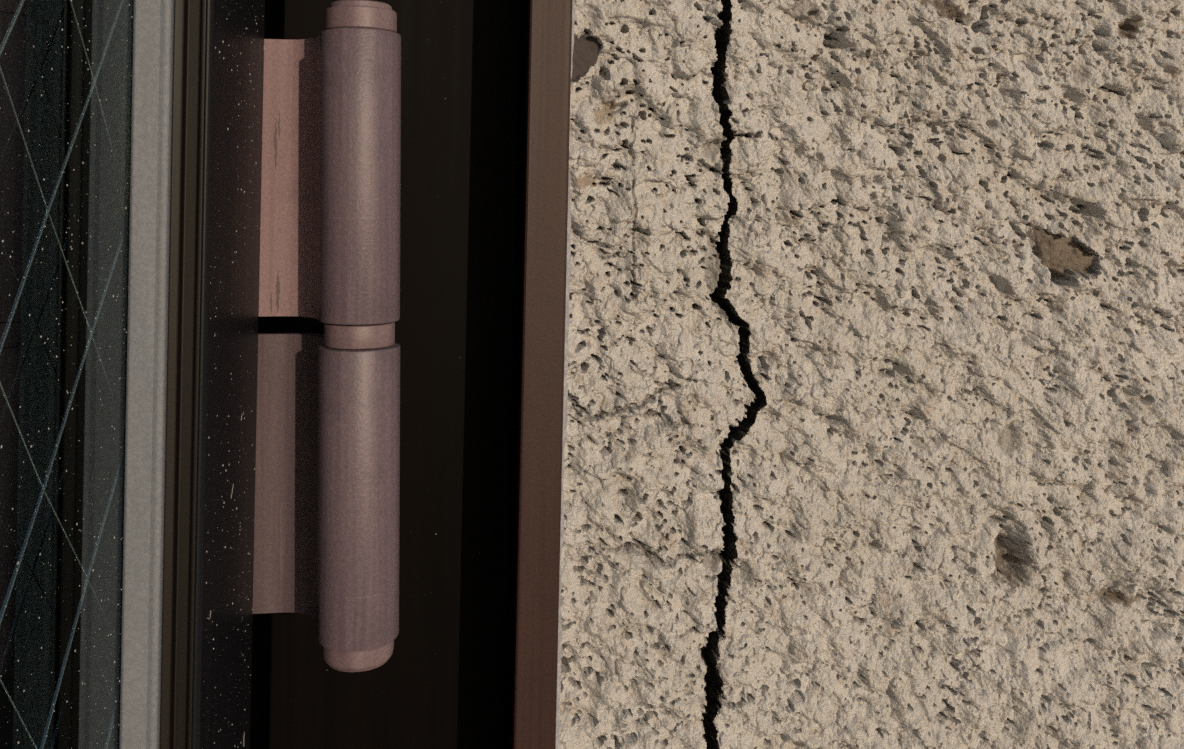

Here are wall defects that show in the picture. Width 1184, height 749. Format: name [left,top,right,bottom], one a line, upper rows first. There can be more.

crack [700,0,767,749]